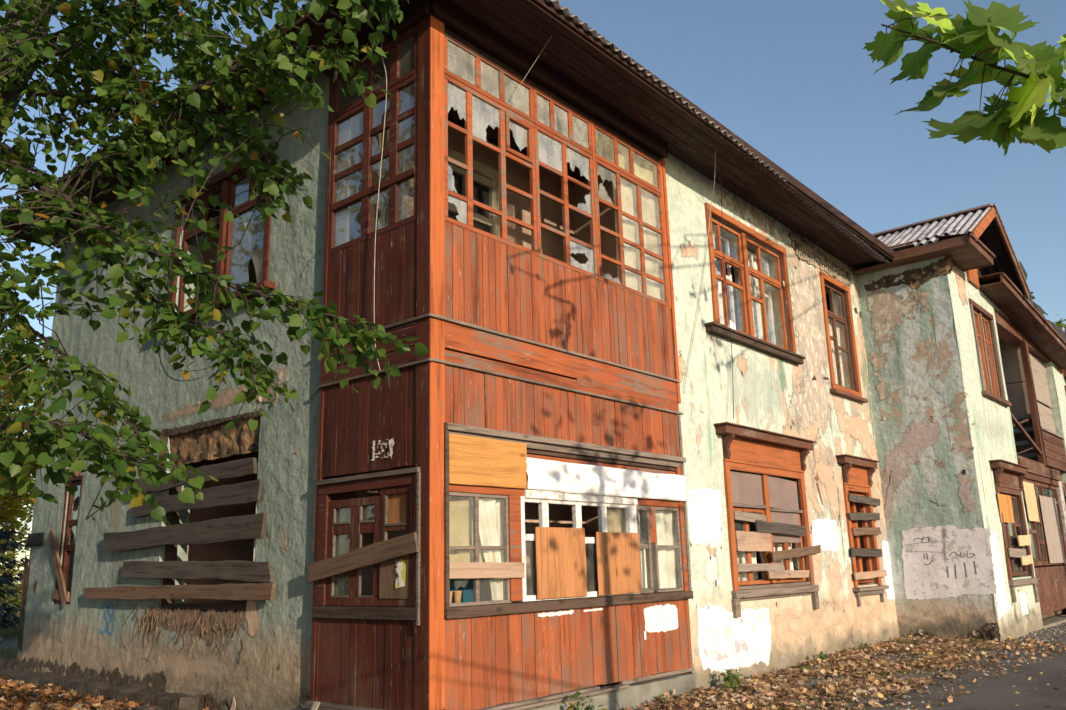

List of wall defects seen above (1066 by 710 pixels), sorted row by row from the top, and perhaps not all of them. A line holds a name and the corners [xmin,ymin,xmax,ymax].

peeling [716,186,785,248]
peeling [159,366,290,462]
peeling [737,353,748,377]
peeling [782,255,976,529]